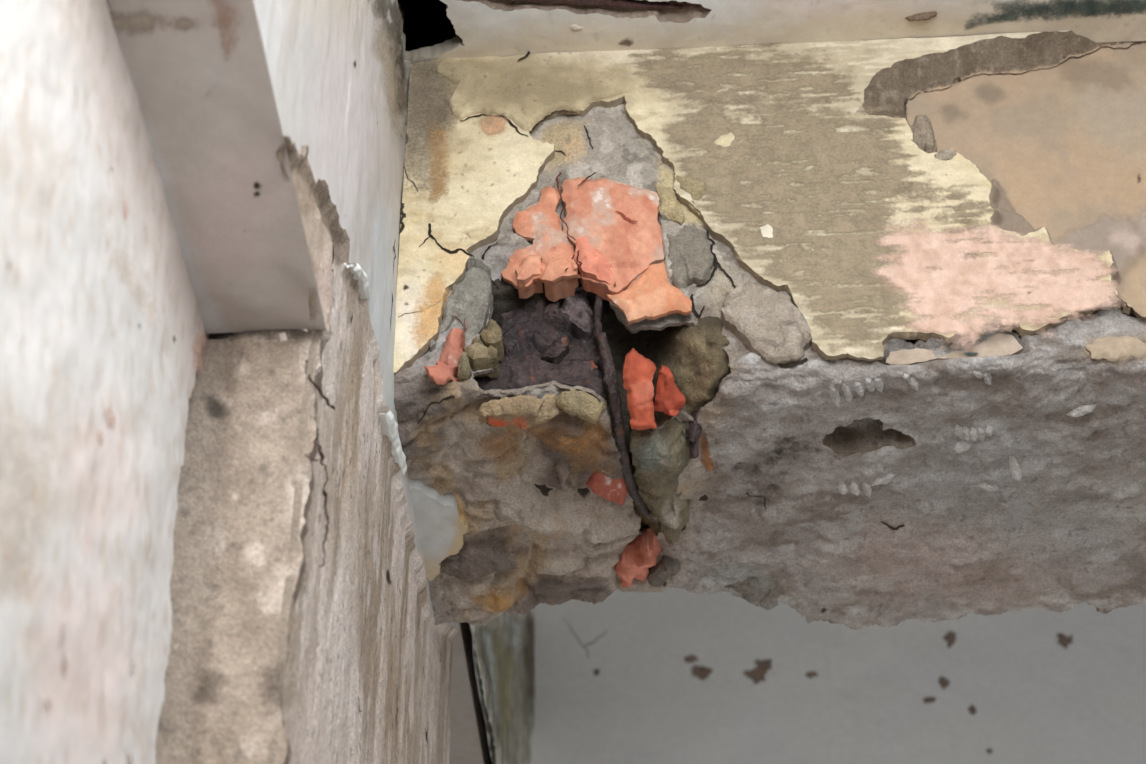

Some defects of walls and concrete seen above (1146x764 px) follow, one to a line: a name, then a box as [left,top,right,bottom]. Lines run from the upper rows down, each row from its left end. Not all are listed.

spalling [462,0,711,31]
water stain [377,0,449,199]
crack [305,245,335,567]
flaking render [155,145,662,764]
crack [390,294,441,330]
crack [393,134,499,289]
crack [460,110,596,271]
crack [690,229,736,318]
flaking render [434,30,1146,630]
water stain [631,43,997,350]
peeling [685,655,712,680]
peeling [744,659,771,684]